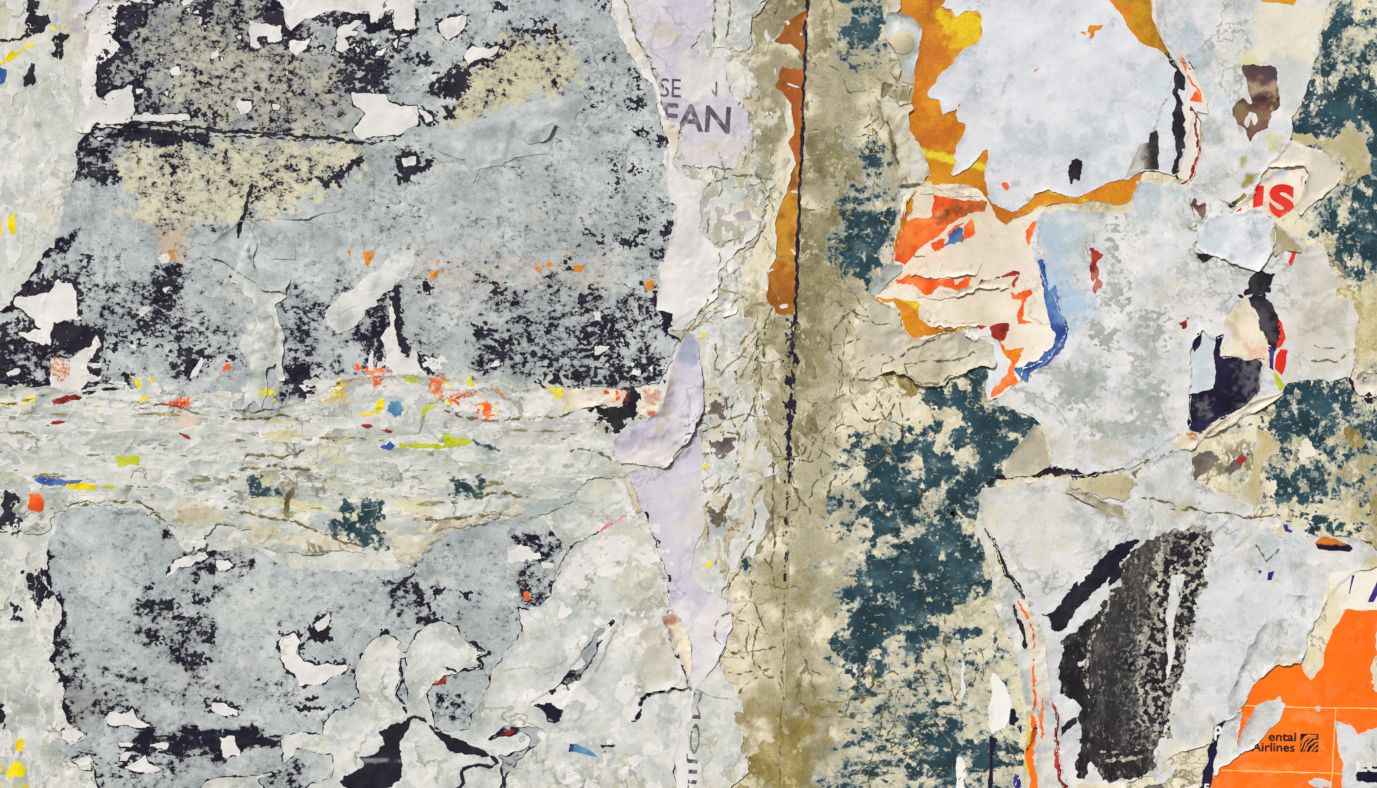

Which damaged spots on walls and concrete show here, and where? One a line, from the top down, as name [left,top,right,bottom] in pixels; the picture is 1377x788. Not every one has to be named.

peeling [23,63,36,87]
peeling [24,0,70,60]
peeling [209,18,410,75]
peeling [435,13,500,68]
peeling [131,112,193,124]
peeling [351,89,433,141]
peeling [10,276,104,393]
peeling [507,544,554,568]
peeling [1149,531,1206,678]
peeling [278,631,349,689]
peeling [105,707,170,775]
peeling [218,735,242,760]